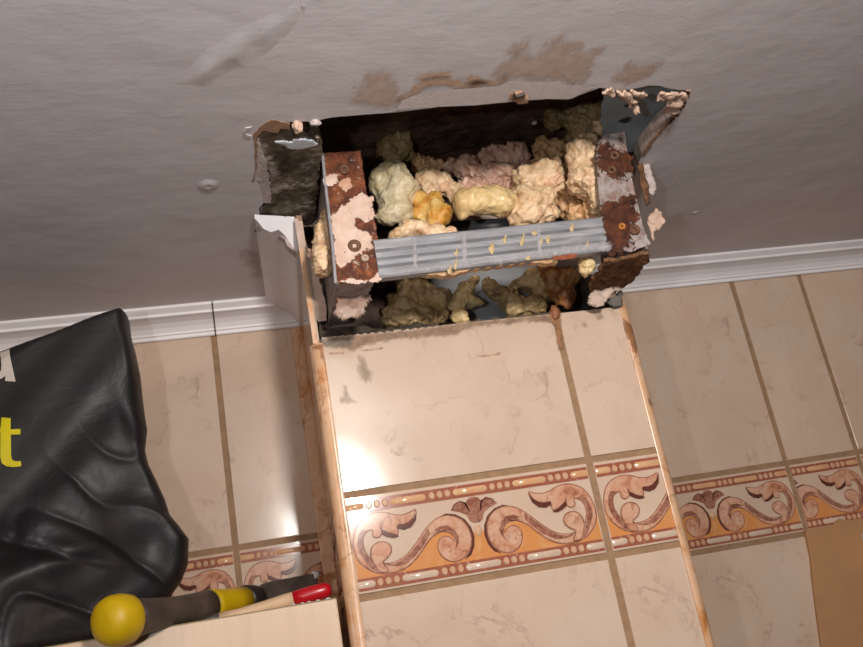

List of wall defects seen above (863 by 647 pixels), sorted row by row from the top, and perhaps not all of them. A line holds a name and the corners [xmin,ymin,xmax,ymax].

water stain [350,35,601,107]
water stain [614,63,657,83]
flaking render [395,81,691,155]
peeling [243,119,323,257]
corrosion [592,142,634,182]
corrosion [598,193,641,256]